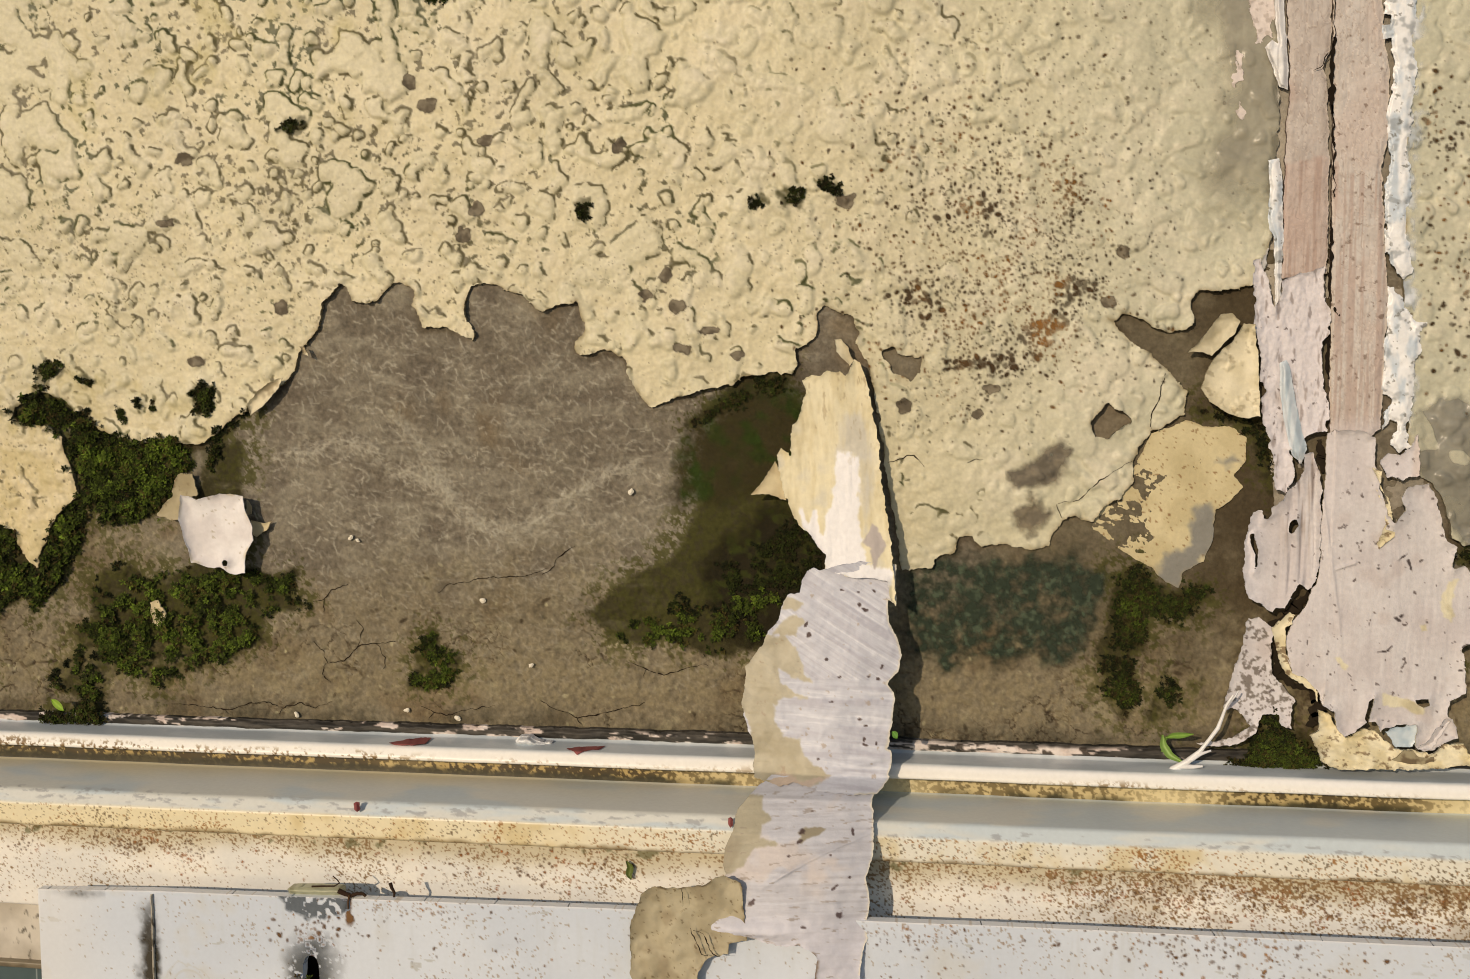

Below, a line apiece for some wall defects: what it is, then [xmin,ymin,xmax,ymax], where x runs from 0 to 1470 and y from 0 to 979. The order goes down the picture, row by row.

peeling [638,267,687,315]
rust [815,80,1136,450]
peeling [1264,250,1283,277]
peeling [1385,253,1402,289]
peeling [0,283,1470,979]
rust [93,829,212,876]
rust [267,899,381,956]
rust [902,867,1470,978]